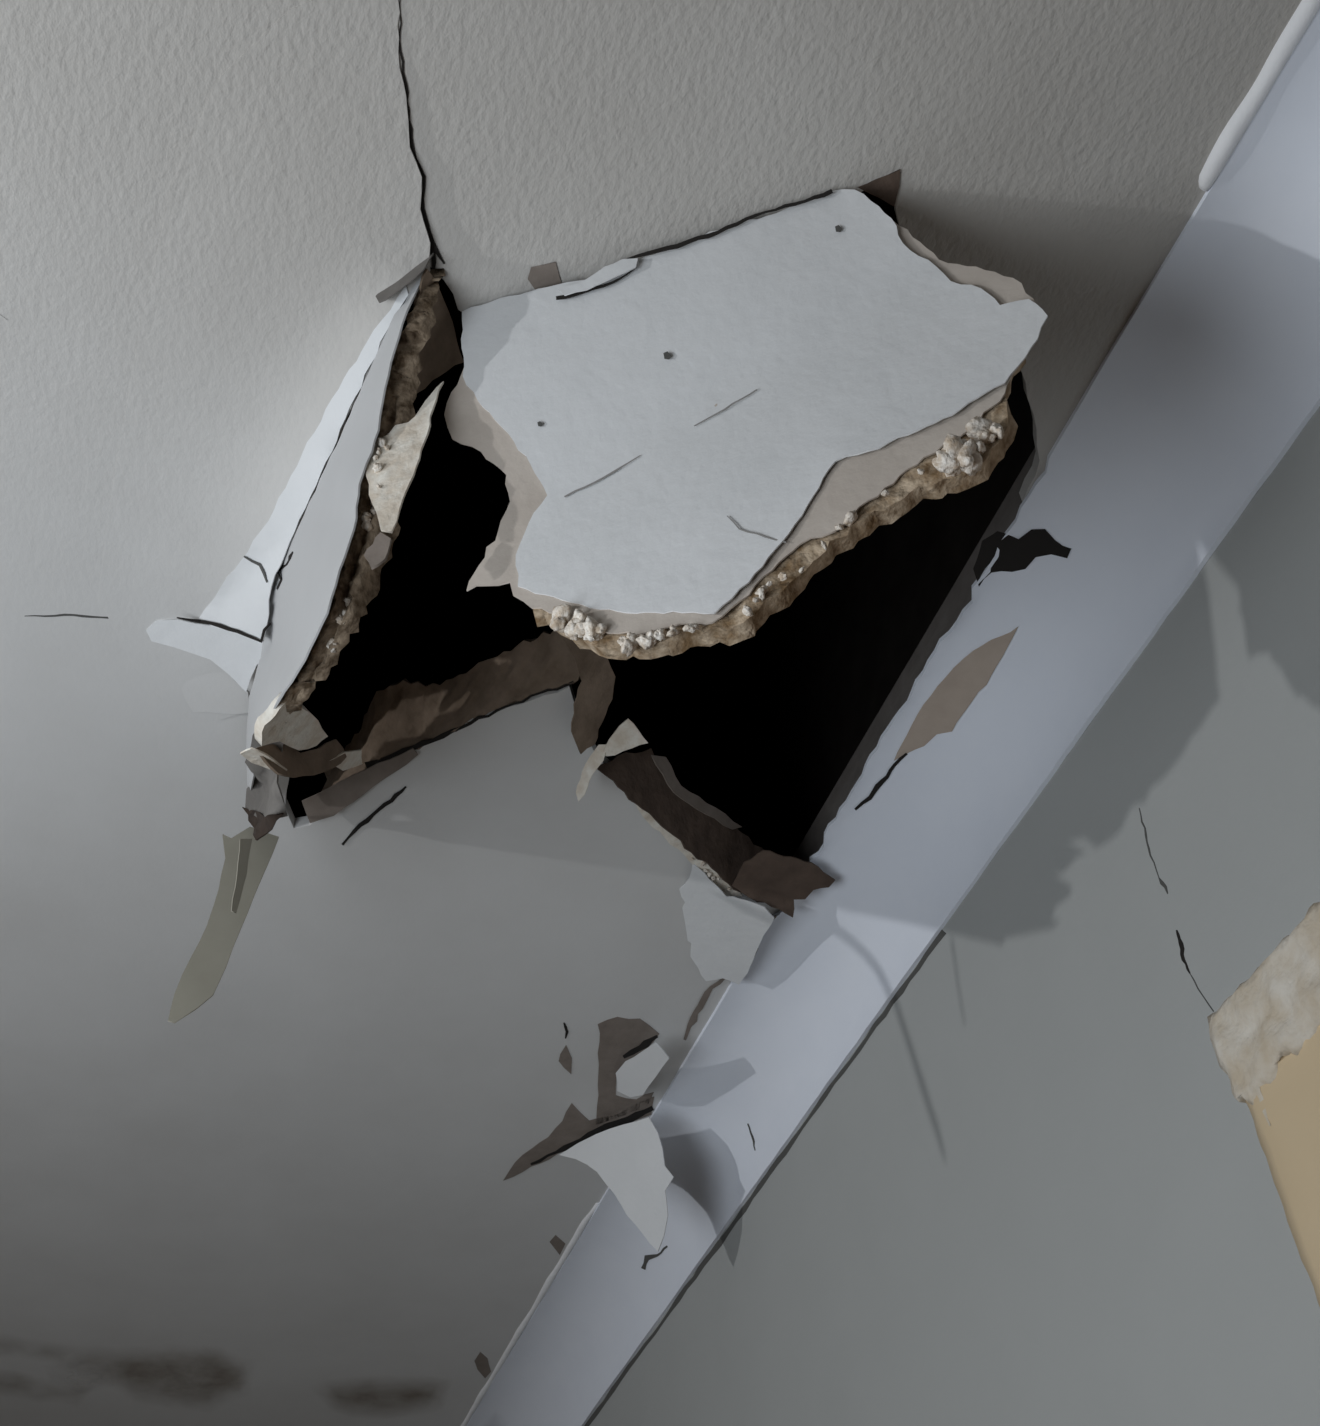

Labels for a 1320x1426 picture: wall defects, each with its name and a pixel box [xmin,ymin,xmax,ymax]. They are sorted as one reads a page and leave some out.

crack [399,0,445,269]
peeling [376,253,434,303]
peeling [528,258,638,296]
spalling [973,529,1071,586]
peeling [146,617,271,714]
peeling [894,627,1018,760]
spalling [302,631,835,984]
peeling [503,1017,674,1270]